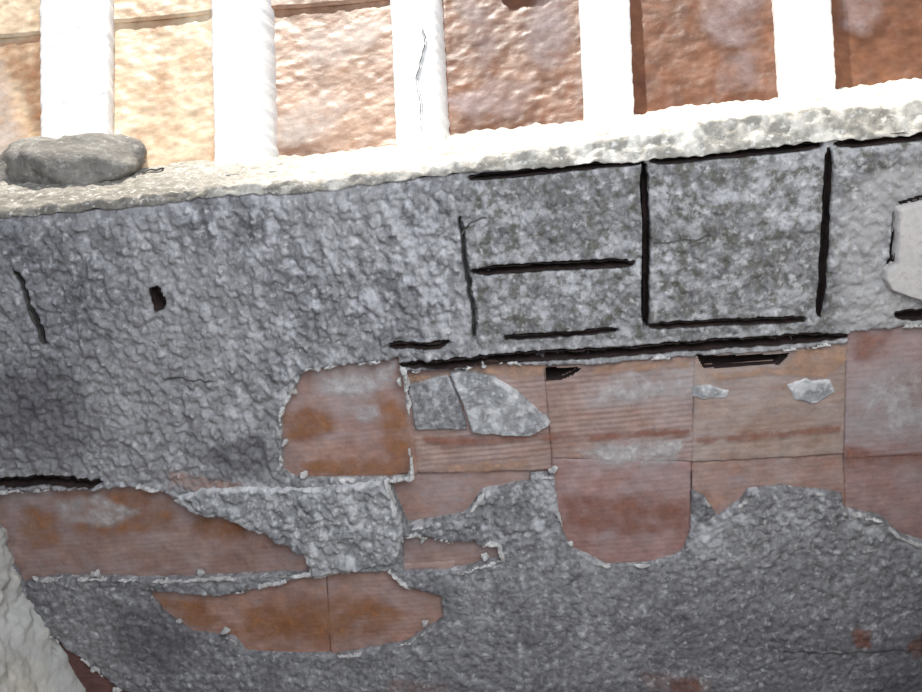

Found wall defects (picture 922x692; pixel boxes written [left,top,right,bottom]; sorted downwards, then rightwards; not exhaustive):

crack [654,235,710,244]
crack [459,217,486,335]
crack [14,271,47,344]
flaking render [396,365,421,417]
flaking render [278,384,298,467]
flaking render [136,483,161,493]
flaking render [384,448,415,504]
flaking render [843,508,922,548]
flaking render [76,569,139,583]
flaking render [152,554,351,594]
flaking render [388,569,410,590]
flaking render [456,540,505,576]